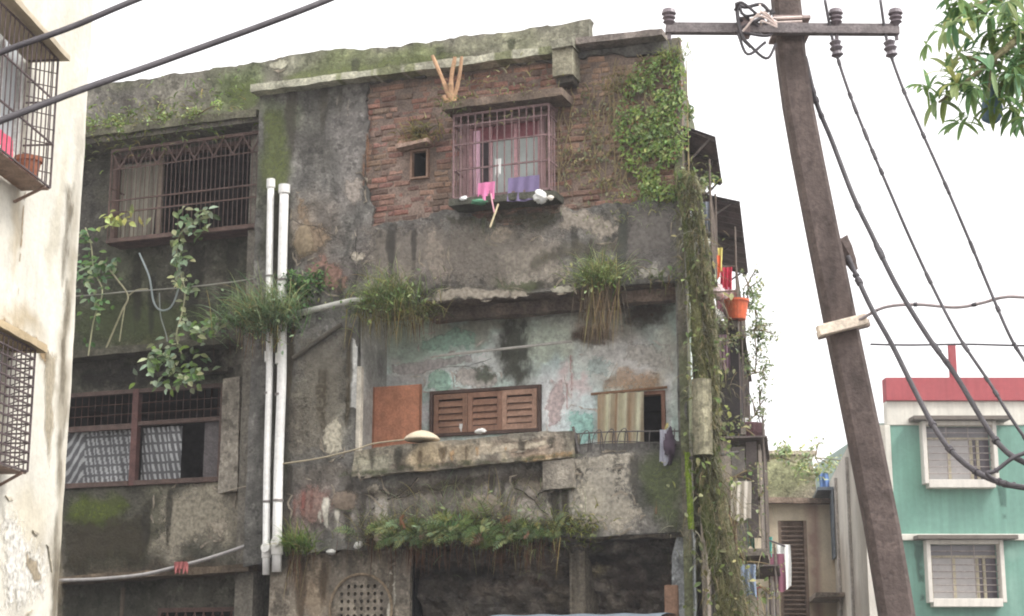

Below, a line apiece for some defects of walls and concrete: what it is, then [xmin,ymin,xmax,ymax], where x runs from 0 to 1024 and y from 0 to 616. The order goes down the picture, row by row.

damp [63,189,74,267]
flaking render [345,38,684,303]
damp [475,322,529,384]
flaking render [1,495,53,616]
damp [53,501,151,616]